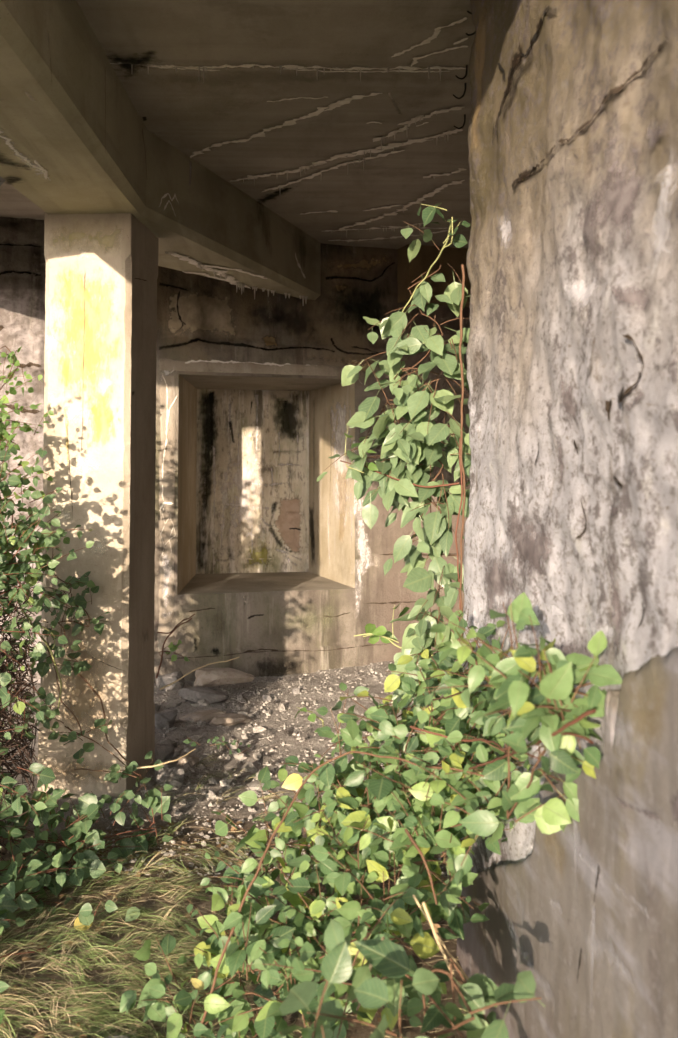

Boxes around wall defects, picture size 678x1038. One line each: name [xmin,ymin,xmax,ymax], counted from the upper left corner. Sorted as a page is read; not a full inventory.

crack [0,131,51,181]
water stain [108,52,154,76]
crack [110,17,468,192]
crack [492,5,557,146]
crack [509,41,666,189]
water stain [199,392,254,568]
water stain [274,396,302,440]
crack [135,168,467,555]